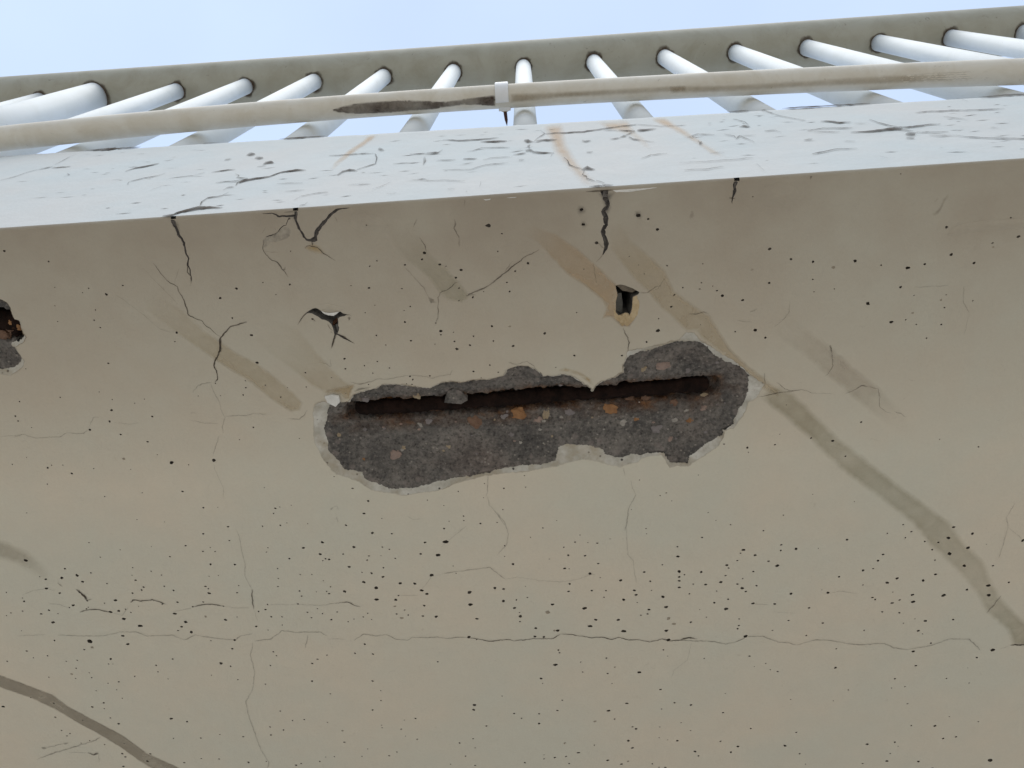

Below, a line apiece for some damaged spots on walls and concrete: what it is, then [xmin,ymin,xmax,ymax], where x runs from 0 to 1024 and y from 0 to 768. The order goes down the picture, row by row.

crack [770,94,1024,153]
crack [87,147,154,181]
crack [416,125,657,254]
crack [156,153,302,381]
crack [262,208,347,274]
spalling [0,299,26,376]
flaking render [614,296,639,326]
spalling [313,332,764,495]
crack [455,634,698,642]
water stain [0,676,177,768]